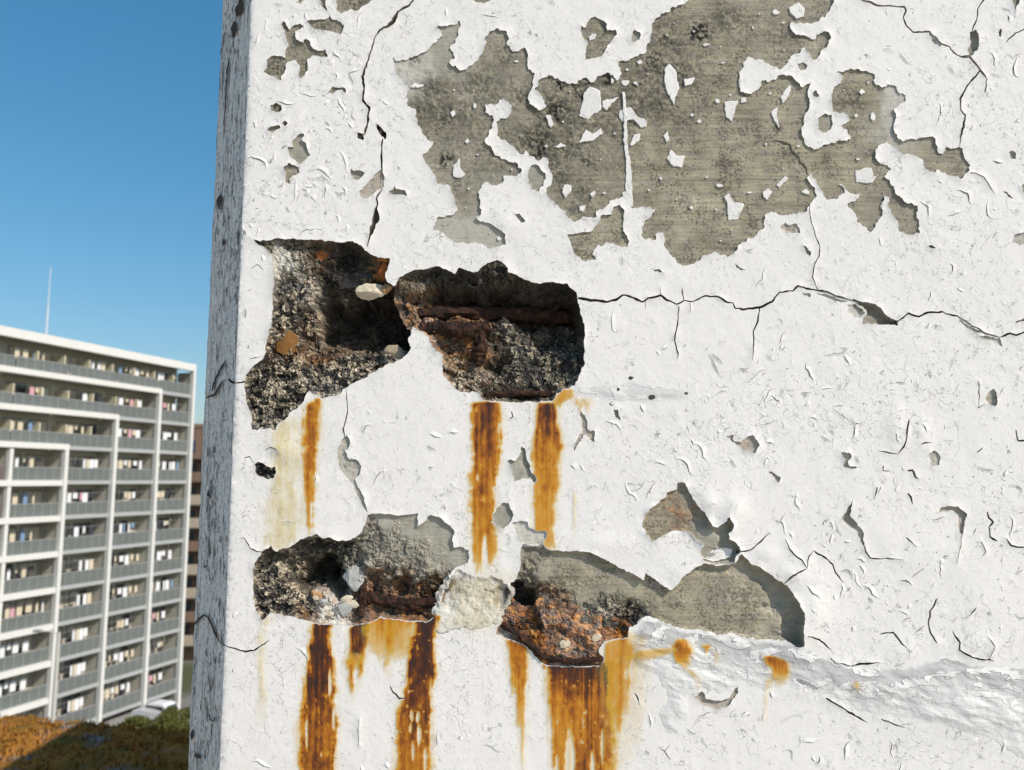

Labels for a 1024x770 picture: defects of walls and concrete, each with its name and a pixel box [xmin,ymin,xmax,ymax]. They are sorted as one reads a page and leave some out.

crack [361,4,411,243]
peeling [393,0,969,270]
crack [959,0,984,136]
spalling [243,238,585,430]
crack [580,256,855,358]
crack [894,311,956,324]
corrosion [301,398,321,530]
corrosion [468,401,503,570]
spalling [253,434,803,666]
corrosion [531,389,583,549]
corrosion [298,615,441,770]
corrosion [543,635,711,770]